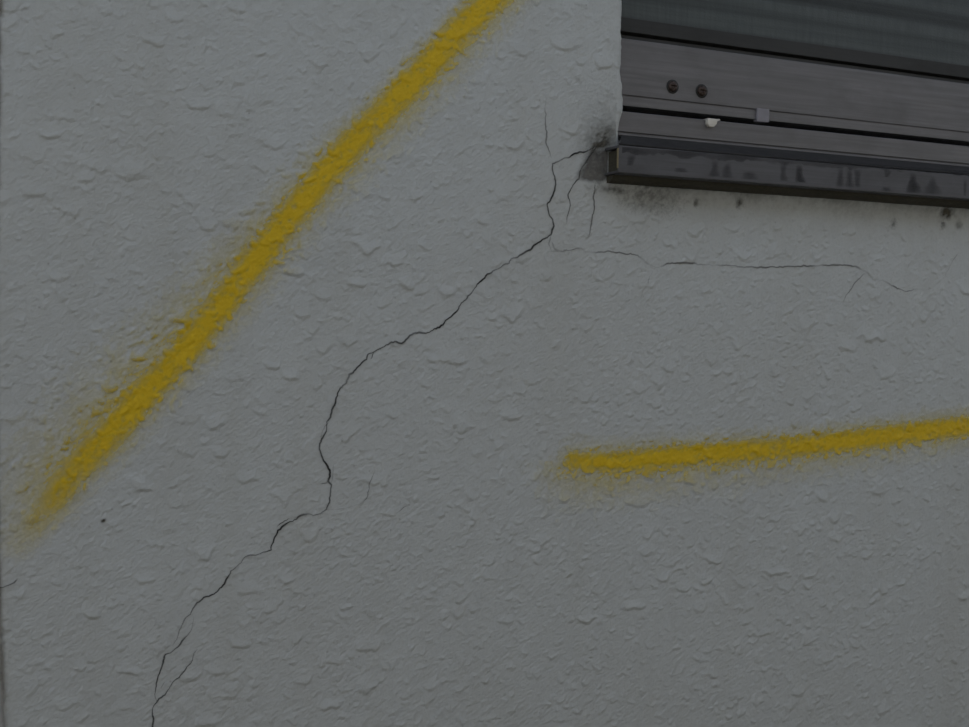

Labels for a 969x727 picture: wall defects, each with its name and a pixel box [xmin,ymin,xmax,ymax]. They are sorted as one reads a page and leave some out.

crack [518,123,597,257]
crack [152,272,492,727]